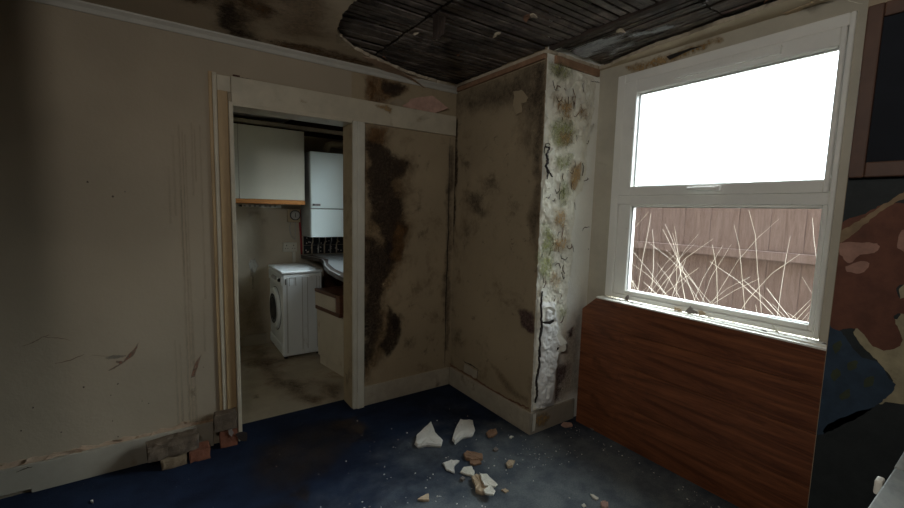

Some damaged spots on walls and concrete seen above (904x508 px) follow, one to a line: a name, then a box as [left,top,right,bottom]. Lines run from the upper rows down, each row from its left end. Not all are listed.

leakage [270,1,373,66]
leakage [364,128,408,370]
peeling [531,63,599,432]